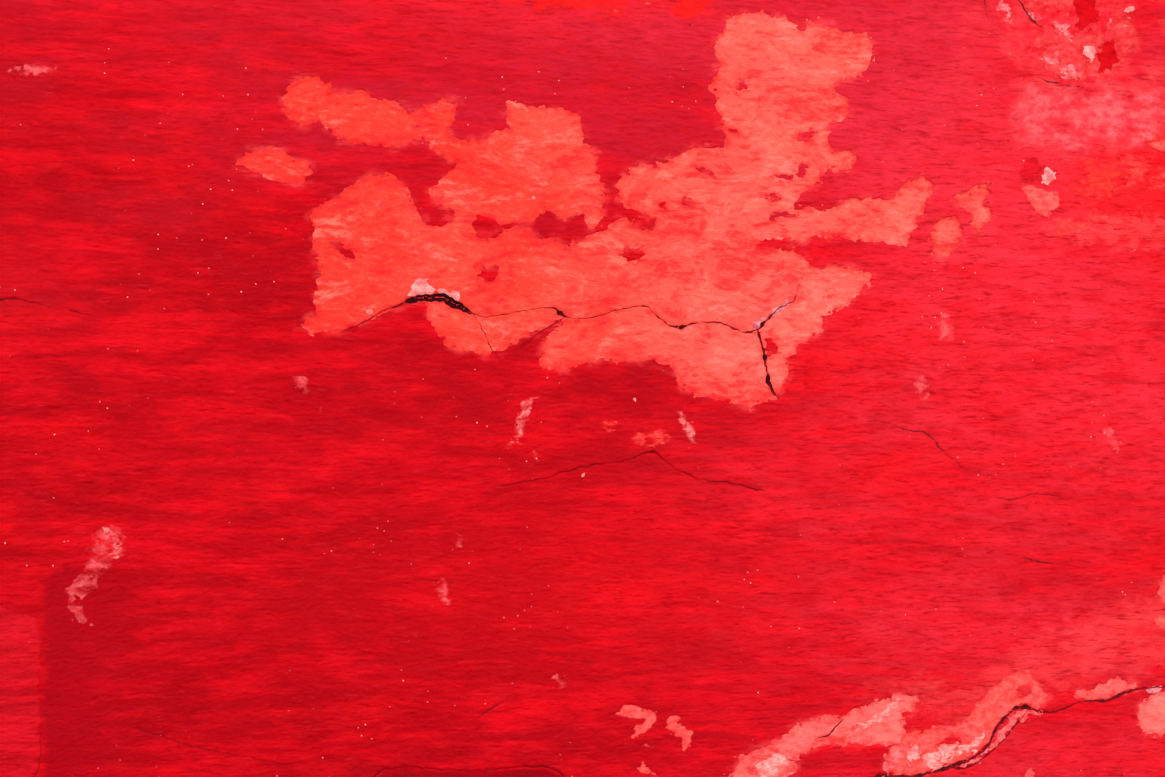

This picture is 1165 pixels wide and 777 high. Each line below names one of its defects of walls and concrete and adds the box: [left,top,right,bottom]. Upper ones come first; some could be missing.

peeling [282,9,935,412]
peeling [931,182,994,258]
crack [341,266,810,399]
crack [493,451,765,491]
peeling [1154,575,1165,631]
peeling [636,761,657,777]
peeling [612,704,695,752]
peeling [728,670,1051,777]
crack [875,686,1165,777]
peeling [1074,676,1165,738]